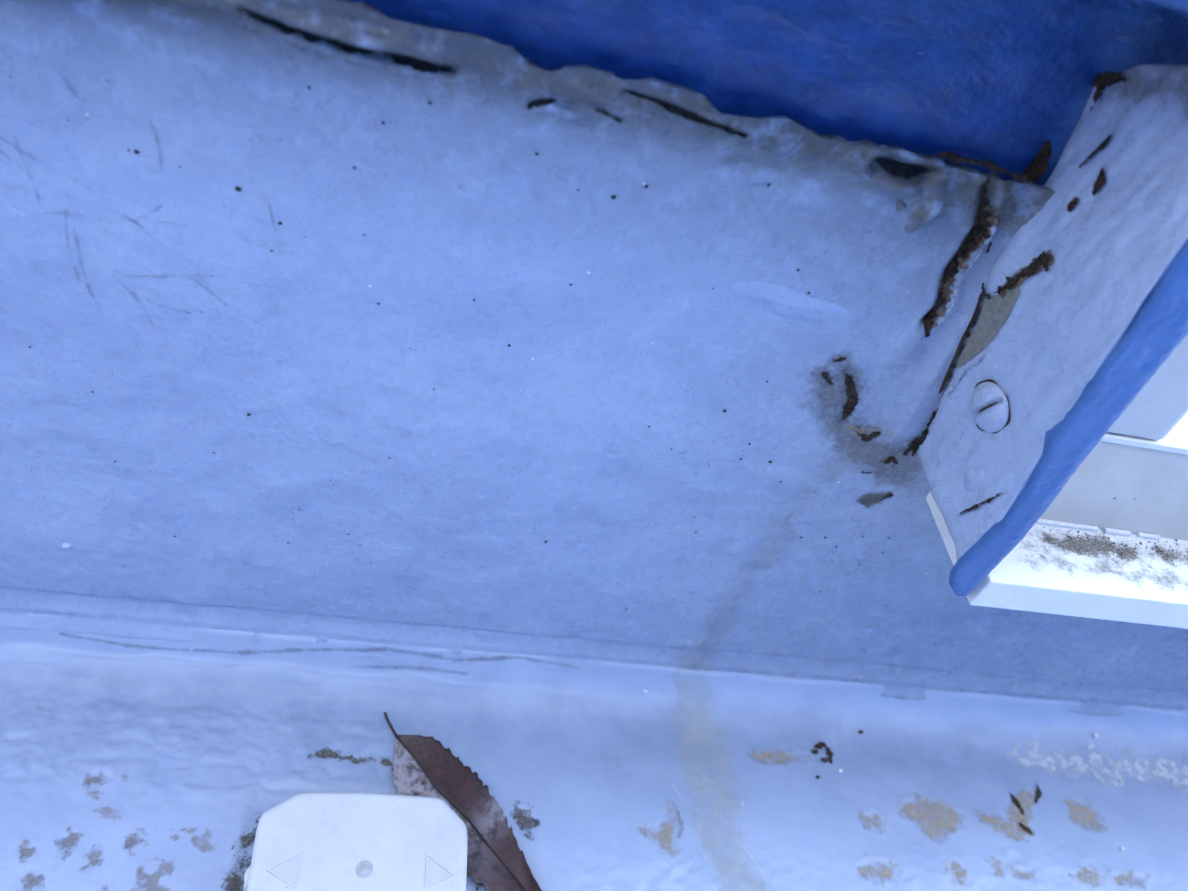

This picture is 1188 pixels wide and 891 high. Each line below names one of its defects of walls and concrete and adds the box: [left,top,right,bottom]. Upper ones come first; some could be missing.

peeling [906,799,957,838]
spalling [62,828,78,848]
spalling [23,874,43,887]